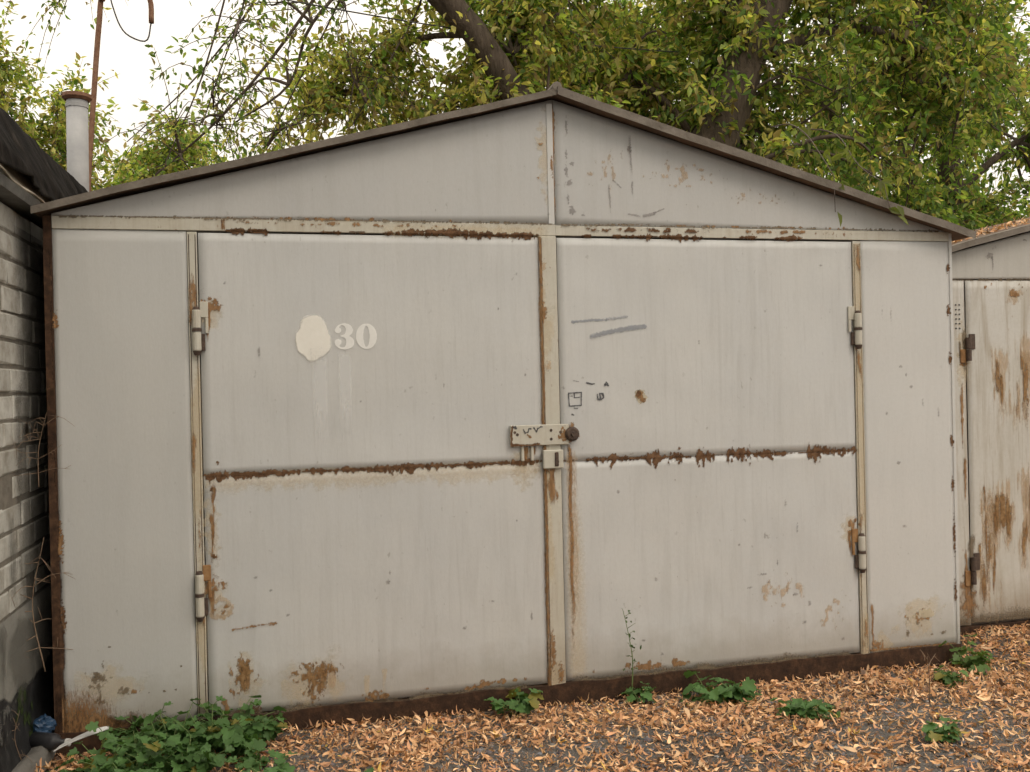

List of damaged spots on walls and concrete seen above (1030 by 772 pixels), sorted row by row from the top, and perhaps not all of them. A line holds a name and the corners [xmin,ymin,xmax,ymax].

rust [221,220,269,235]
rust [612,233,703,243]
rust [43,247,59,395]
rust [189,279,221,336]
rust [947,265,1030,297]
rust [635,390,647,403]
rust [994,362,1003,405]
rust [950,387,967,497]
rust [192,422,857,686]
rust [953,487,1028,622]
rust [48,446,134,733]
rust [220,654,343,716]